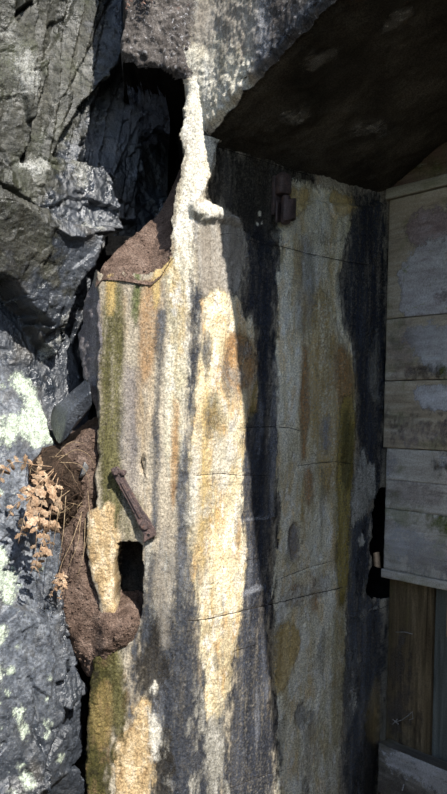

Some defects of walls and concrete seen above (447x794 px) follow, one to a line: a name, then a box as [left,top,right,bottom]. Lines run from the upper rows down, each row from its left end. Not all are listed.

damp [78,280,115,412]
damp [109,0,414,794]
damp [86,502,121,613]
crack [189,560,343,621]